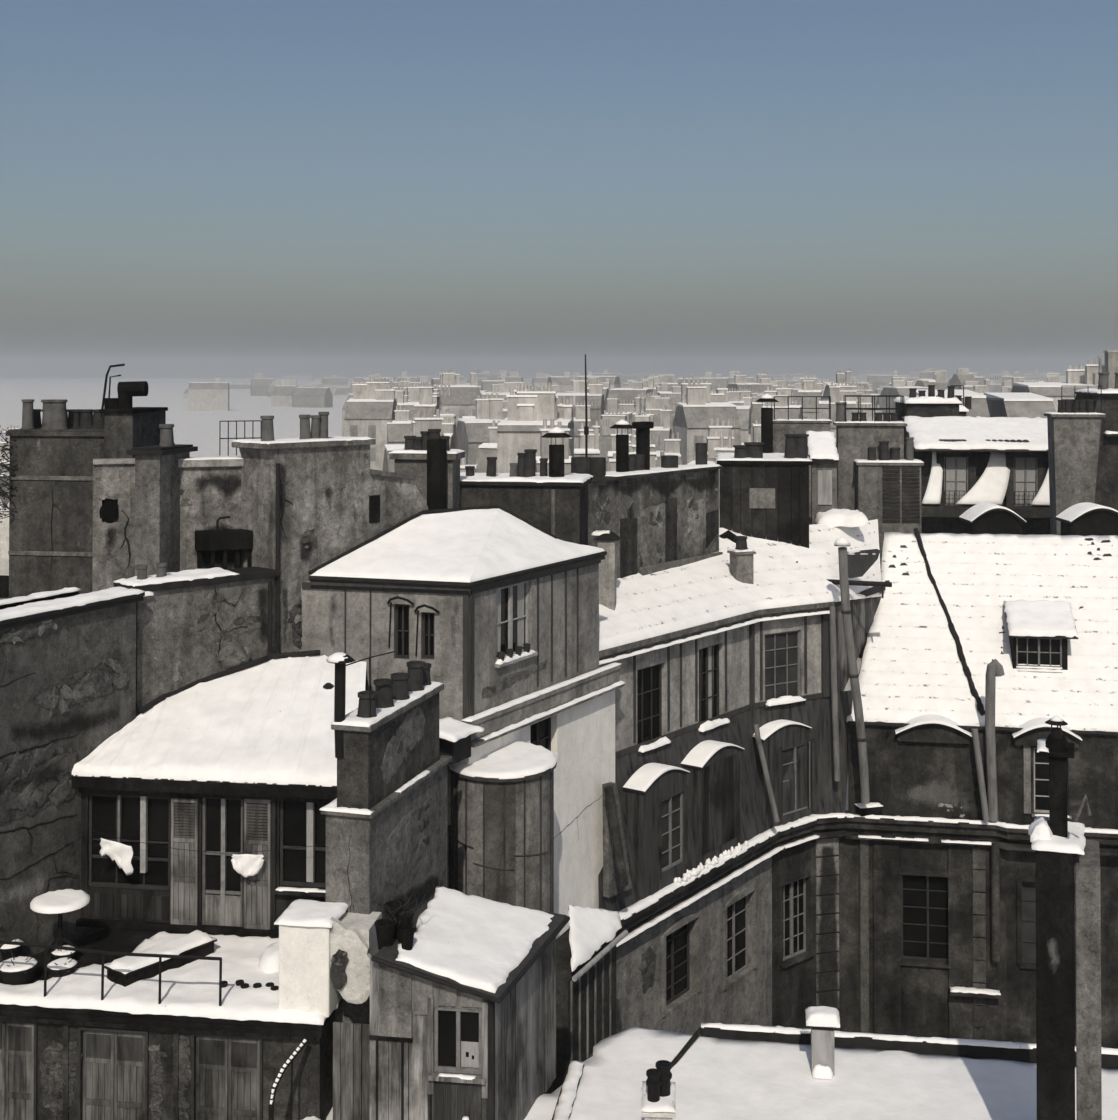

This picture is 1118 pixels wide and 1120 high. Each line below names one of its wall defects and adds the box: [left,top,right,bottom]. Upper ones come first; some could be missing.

damp [198,476,241,496]
crack [120,510,131,570]
crack [214,585,248,669]
crack [0,734,77,759]
crack [0,814,80,917]